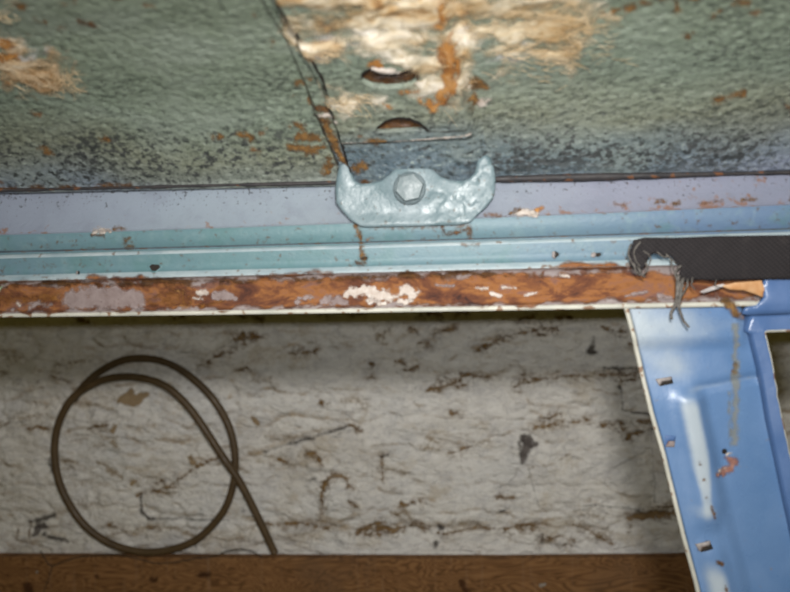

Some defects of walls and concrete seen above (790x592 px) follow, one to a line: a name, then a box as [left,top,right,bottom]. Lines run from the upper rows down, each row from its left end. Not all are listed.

corrosion [363,3,489,112]
crack [264,0,471,173]
peeling [317,94,385,124]
peeling [63,285,145,324]
peeling [194,289,238,301]
peeling [294,284,419,317]
peeling [700,281,765,297]
corrosion [716,453,738,477]